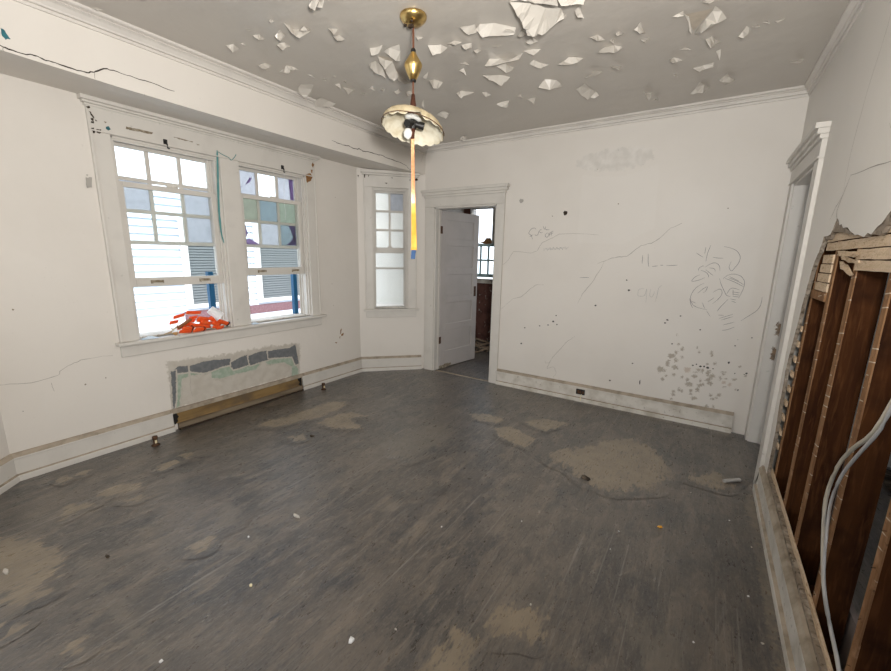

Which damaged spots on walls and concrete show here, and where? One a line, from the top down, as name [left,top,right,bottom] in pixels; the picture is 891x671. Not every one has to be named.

peeling [309,0,324,10]
peeling [269,19,311,50]
peeling [416,0,585,86]
peeling [589,31,624,53]
peeling [673,0,727,72]
crack [0,45,172,95]
peeling [258,45,412,107]
peeling [423,73,443,89]
peeling [497,79,562,108]
crack [830,161,891,220]
spalling [825,220,854,240]
spalling [870,213,891,236]